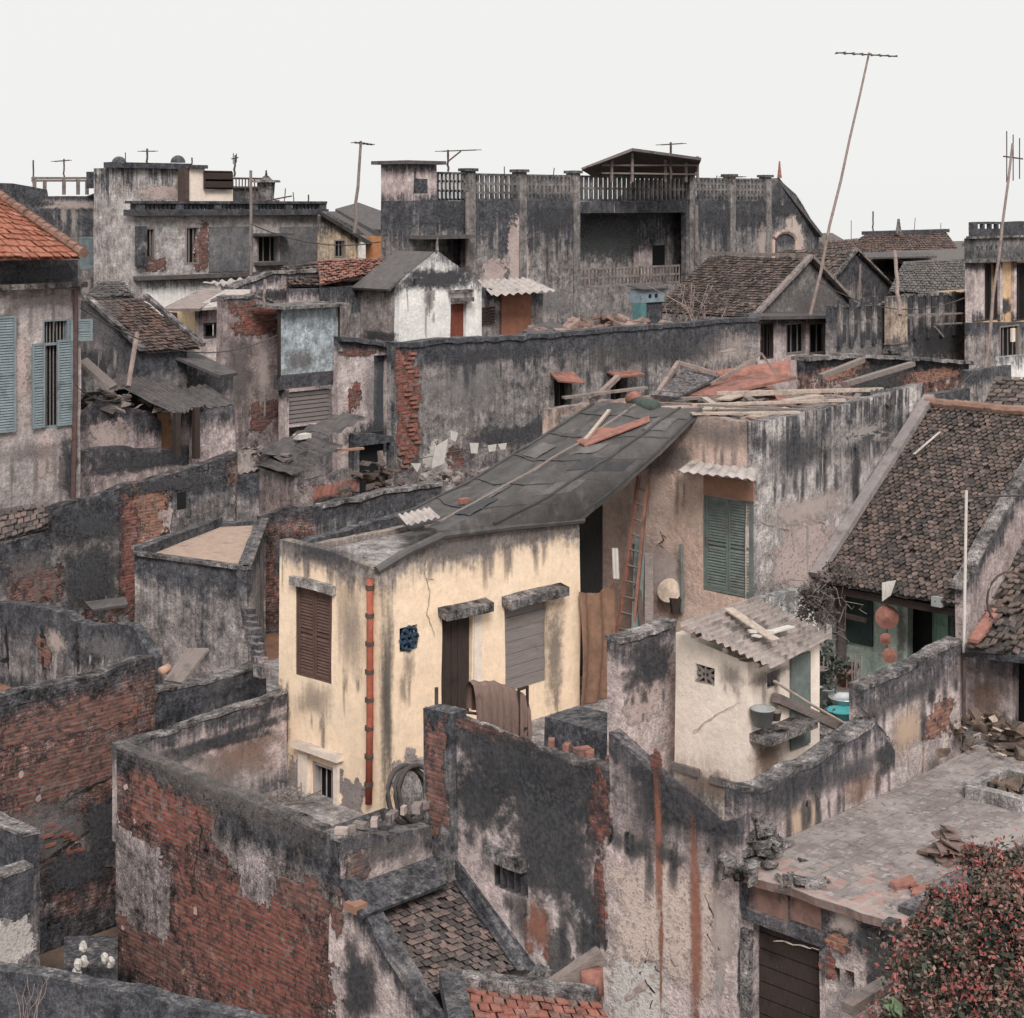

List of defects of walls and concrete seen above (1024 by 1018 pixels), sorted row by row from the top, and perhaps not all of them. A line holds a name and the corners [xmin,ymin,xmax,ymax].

spalling [228,300,277,339]
damp [393,267,479,310]
damp [434,203,465,230]
damp [766,417,903,564]
spalling [0,688,167,813]
spalling [392,706,537,853]
crack [692,702,741,734]
spalling [101,764,372,1018]
damp [456,727,740,1005]
peeling [542,765,740,1018]
rust [654,780,663,1002]
rust [690,838,701,1017]